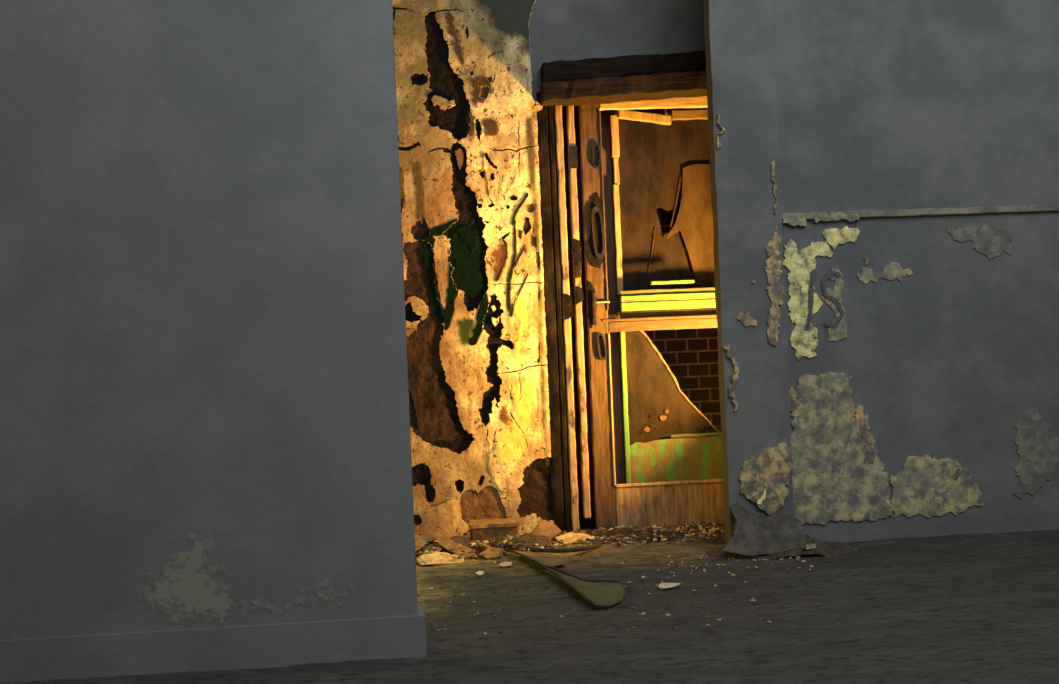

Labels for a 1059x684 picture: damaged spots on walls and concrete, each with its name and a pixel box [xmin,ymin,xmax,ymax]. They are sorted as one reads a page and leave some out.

spalling [402,220,474,454]
spalling [410,12,541,427]
peeling [736,157,860,361]
peeling [856,256,913,284]
spalling [412,463,436,502]
spalling [455,457,554,524]
flaking render [738,371,984,525]